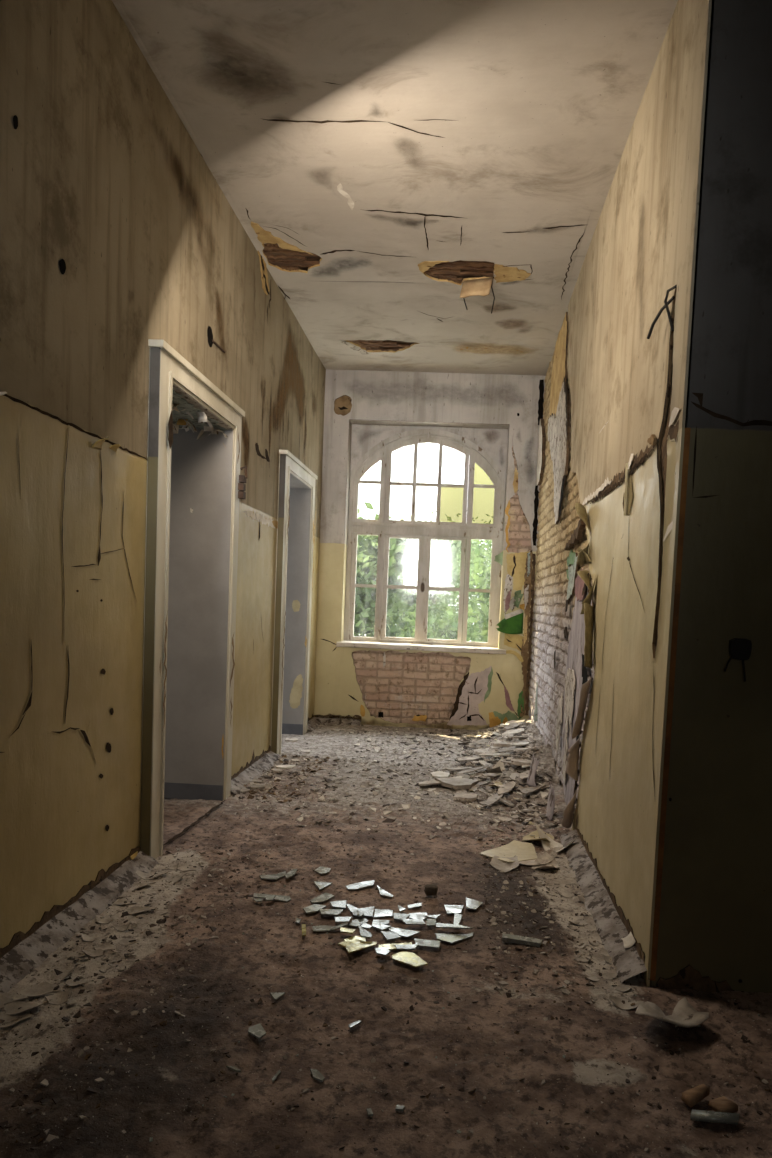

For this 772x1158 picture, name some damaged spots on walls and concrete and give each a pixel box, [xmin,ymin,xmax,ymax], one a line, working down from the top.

crack [264,119,459,138]
crack [0,394,147,764]
flaking render [308,285,679,979]